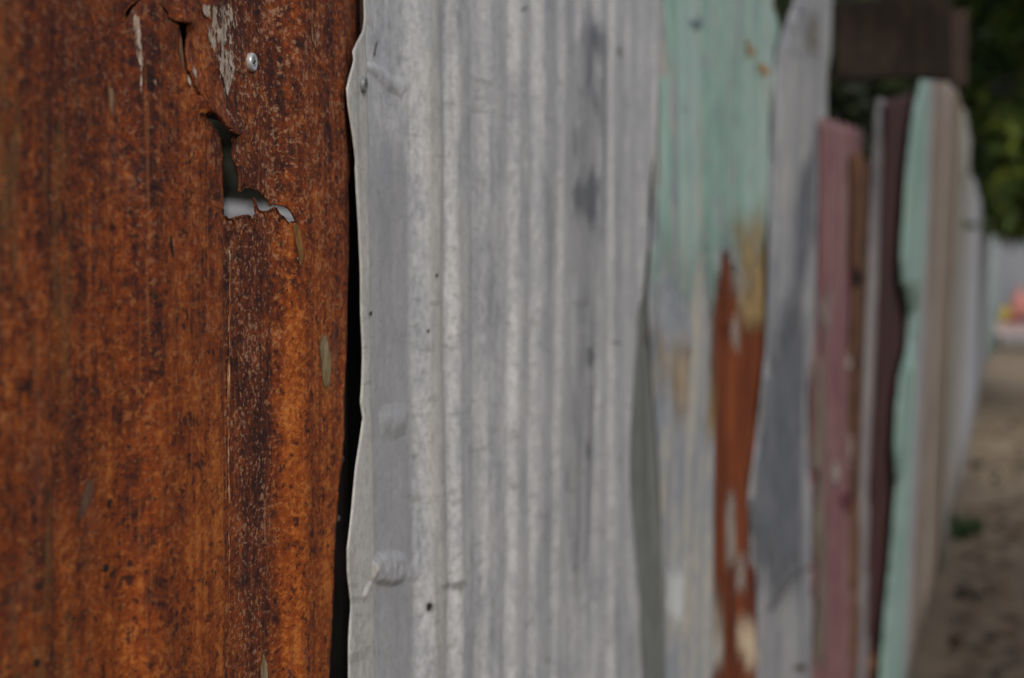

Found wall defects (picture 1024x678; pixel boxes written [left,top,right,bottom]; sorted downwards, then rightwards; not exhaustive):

peeling [203,3,237,118]
rust [706,221,767,678]